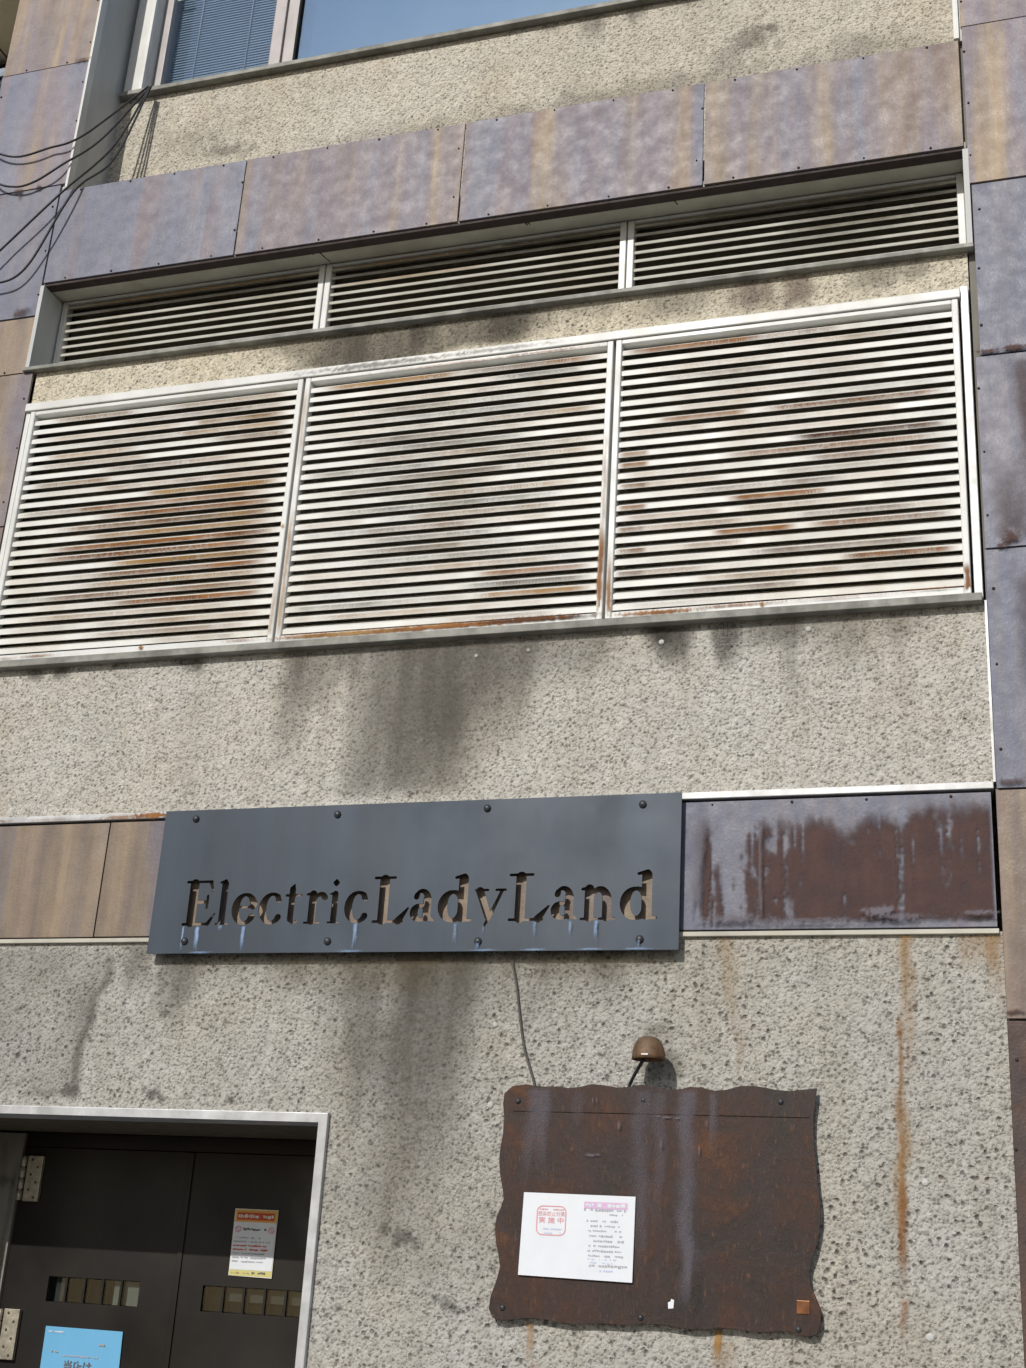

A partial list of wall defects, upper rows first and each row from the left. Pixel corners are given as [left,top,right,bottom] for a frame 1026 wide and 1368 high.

rust [642,336,748,351]
rust [780,390,925,408]
rust [672,410,738,419]
rust [755,422,935,457]
rust [737,488,819,500]
rust [719,524,788,534]
rust [58,479,268,603]
rust [850,539,947,558]
rust [740,807,994,921]
rust [702,833,723,922]